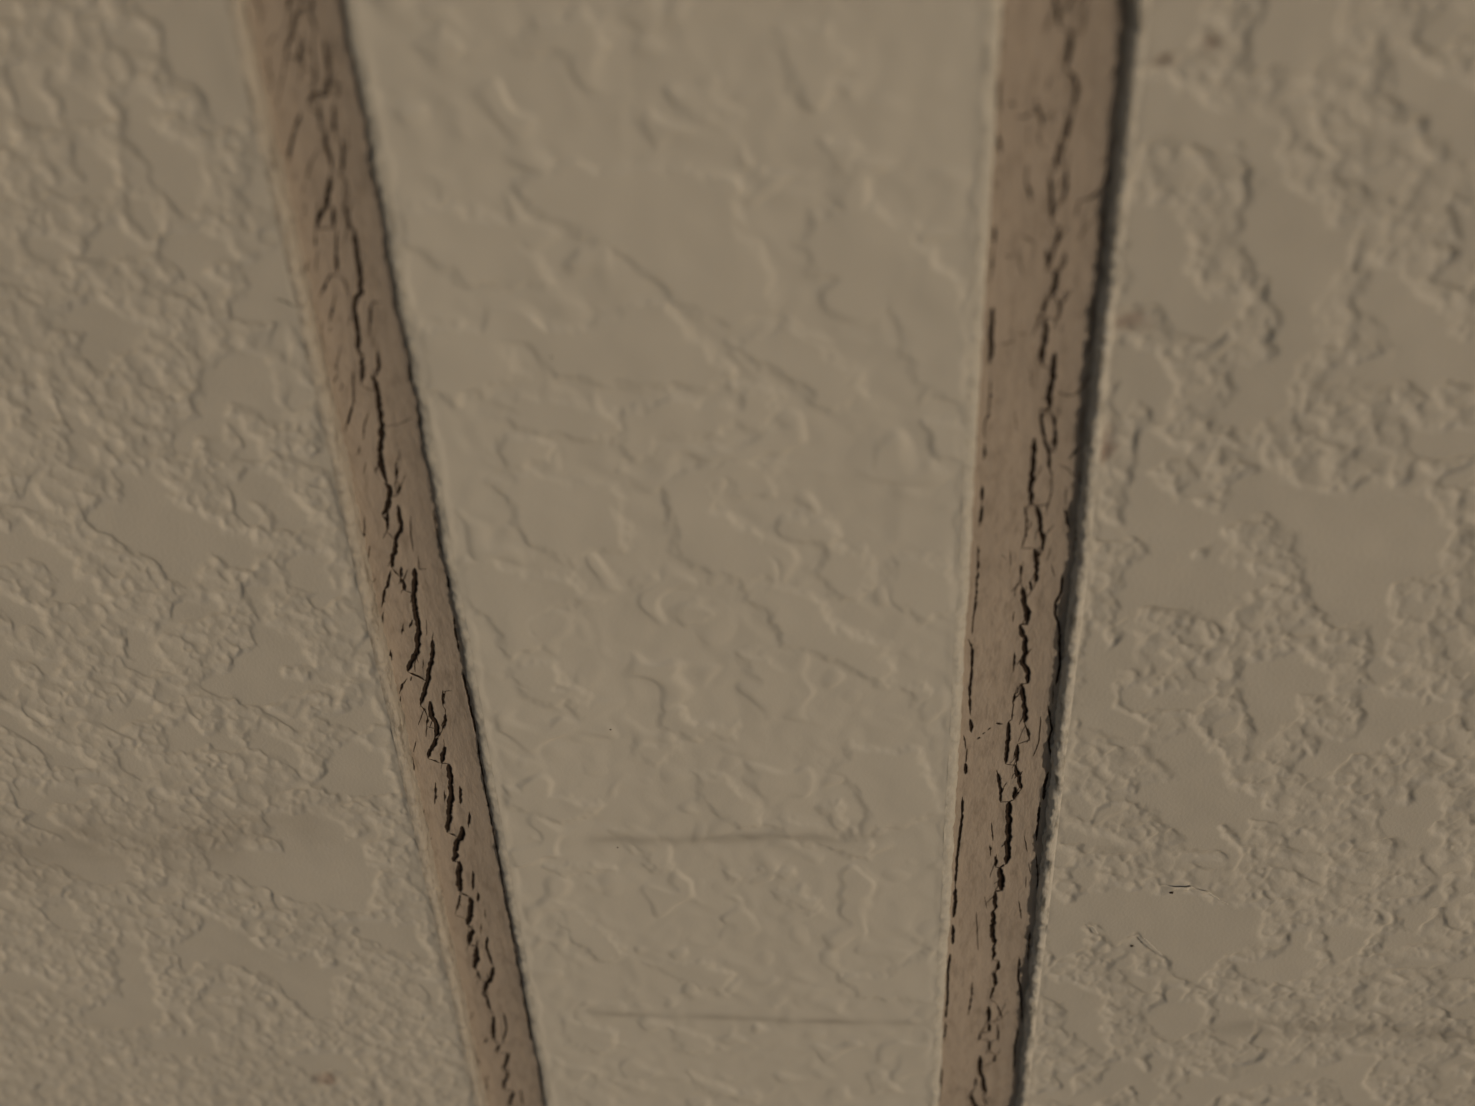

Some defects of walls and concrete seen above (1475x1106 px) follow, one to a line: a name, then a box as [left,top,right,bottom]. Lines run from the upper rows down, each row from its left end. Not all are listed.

crack [277,0,544,1106]
crack [938,0,1124,1106]